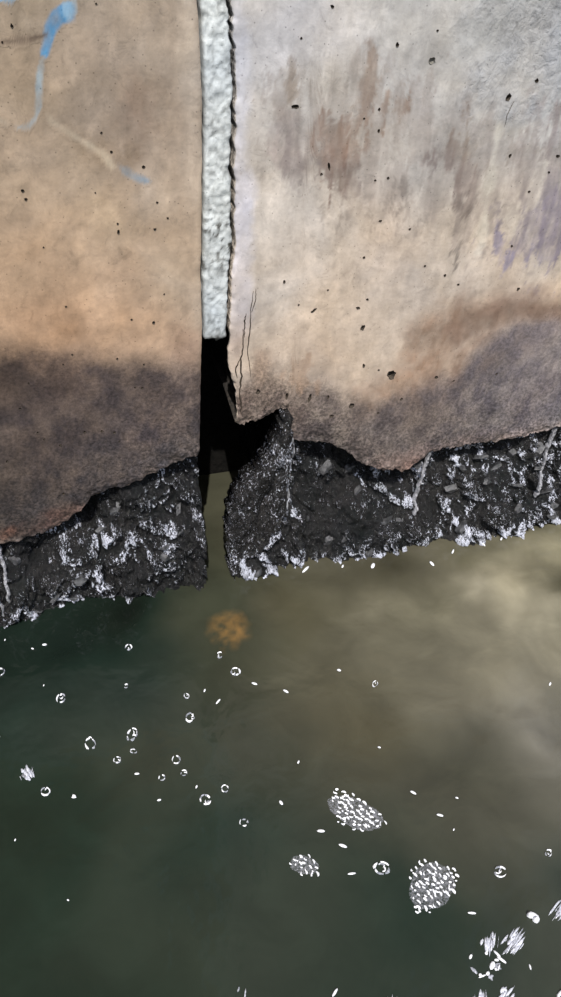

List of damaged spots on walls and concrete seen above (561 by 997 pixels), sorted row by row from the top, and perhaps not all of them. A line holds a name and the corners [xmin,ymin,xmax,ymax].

damp [232,32,561,463]
damp [0,318,202,523]
spalling [0,456,207,629]
crack [235,292,256,413]
spalling [222,408,561,581]